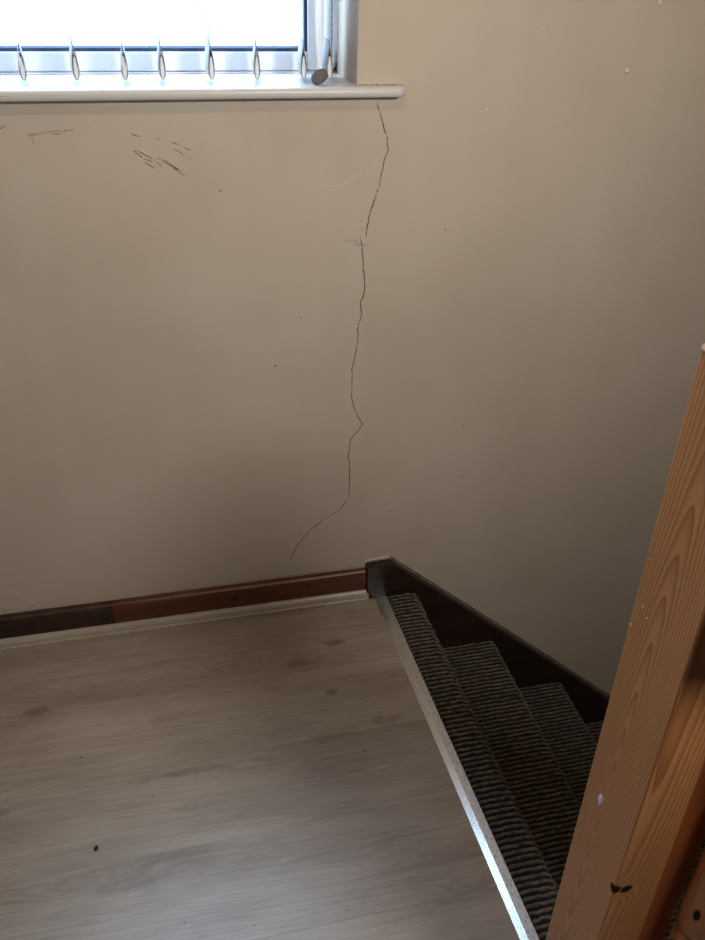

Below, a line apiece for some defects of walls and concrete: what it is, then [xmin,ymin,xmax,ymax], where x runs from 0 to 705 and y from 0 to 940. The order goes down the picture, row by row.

crack [290,84,402,560]